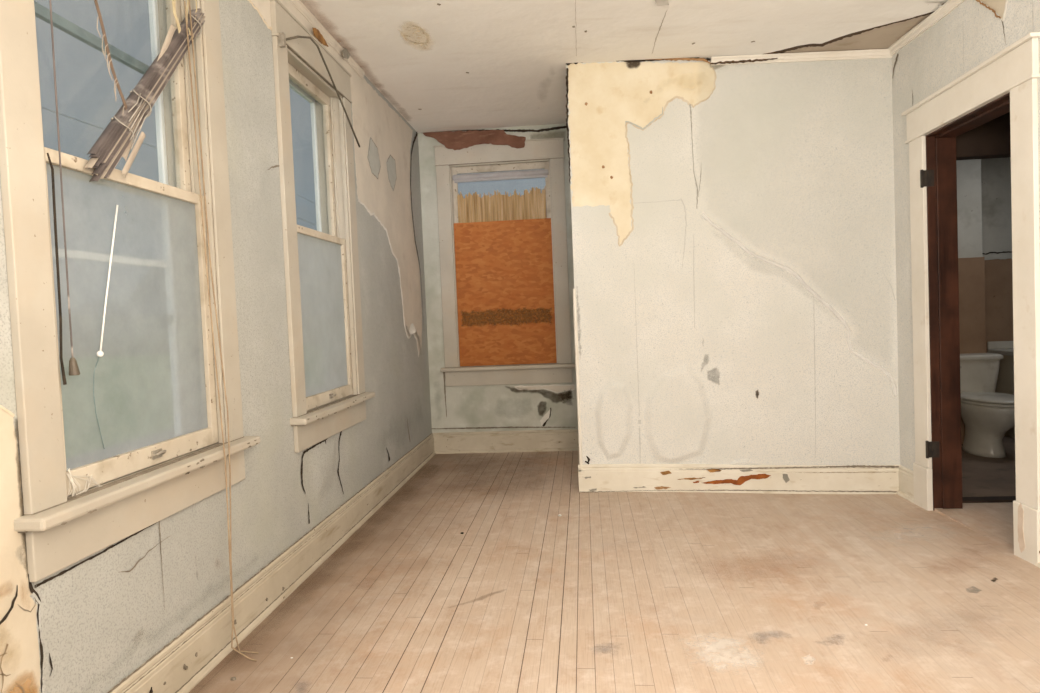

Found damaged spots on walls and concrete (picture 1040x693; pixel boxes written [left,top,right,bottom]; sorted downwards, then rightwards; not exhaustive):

crack [0,523,156,693]
crack [108,426,576,693]